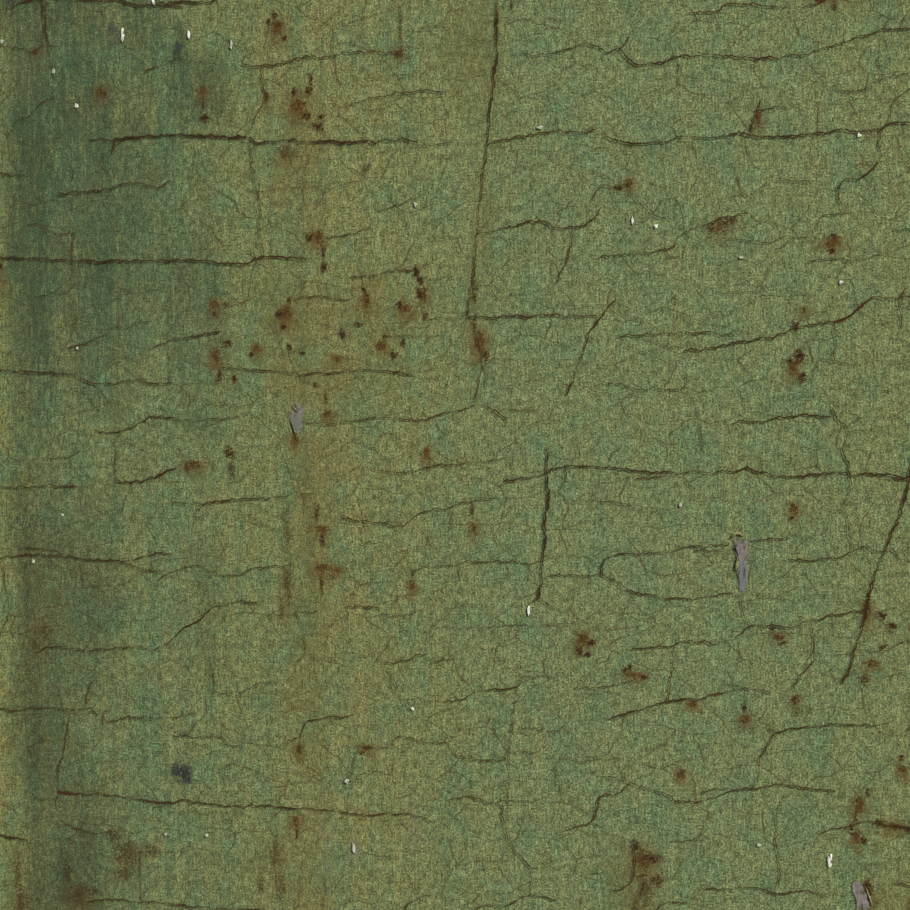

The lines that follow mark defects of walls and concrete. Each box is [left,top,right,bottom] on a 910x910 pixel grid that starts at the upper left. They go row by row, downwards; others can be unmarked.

corrosion [290,71,325,132]
corrosion [411,264,428,320]
corrosion [212,339,237,384]
corrosion [376,334,406,360]
corrosion [787,347,807,383]
peeling [731,532,749,592]
corrosion [862,589,898,629]
corrosion [576,631,596,657]
crack [334,408,910,910]
damp [172,764,192,783]
corrosion [629,839,665,887]
peeling [852,881,873,910]